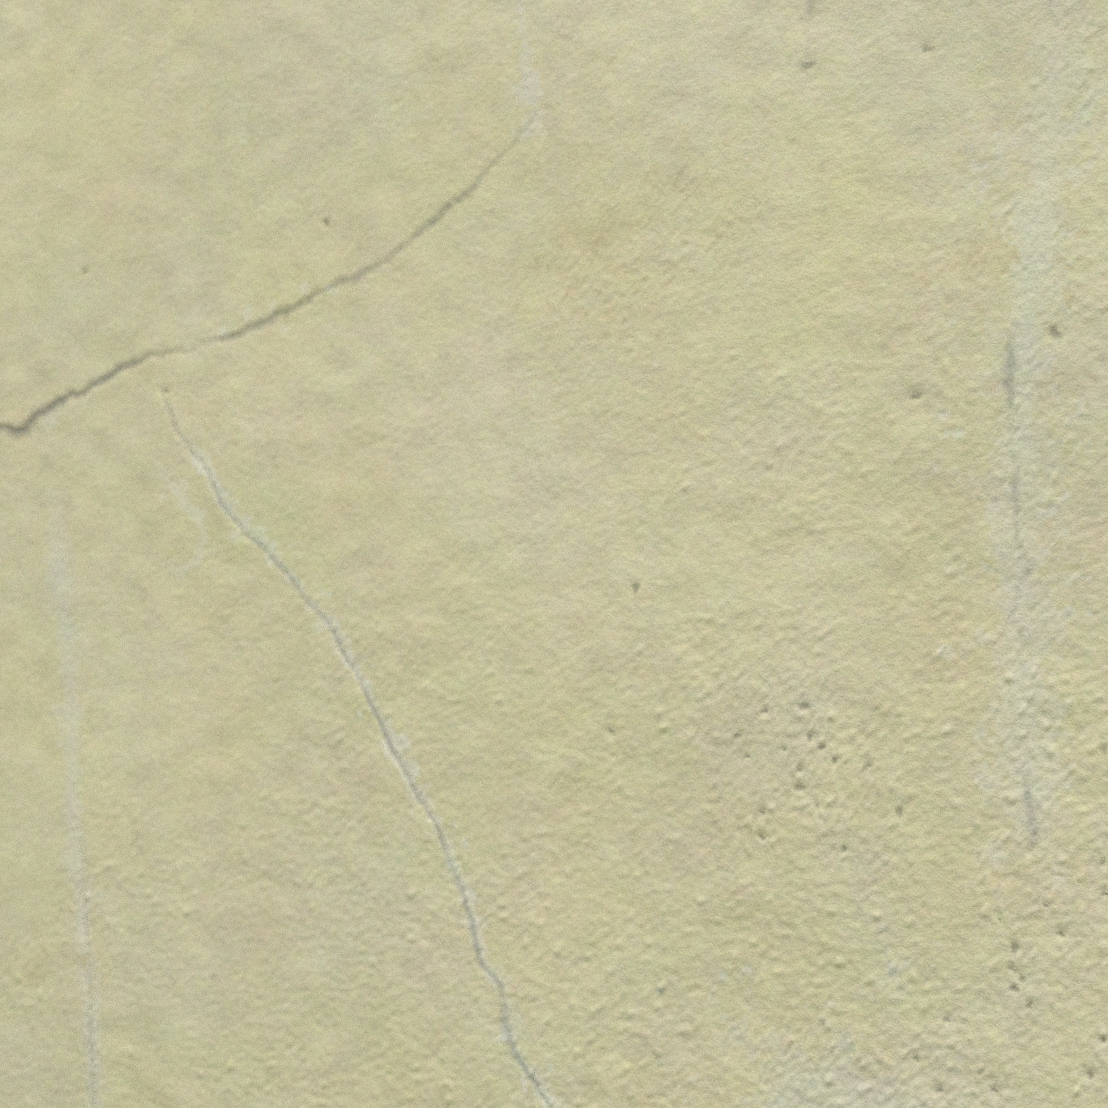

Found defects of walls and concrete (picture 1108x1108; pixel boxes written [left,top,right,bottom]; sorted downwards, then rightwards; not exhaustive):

crack [219,280,339,338]
crack [40,403,66,429]
crack [150,403,572,1108]